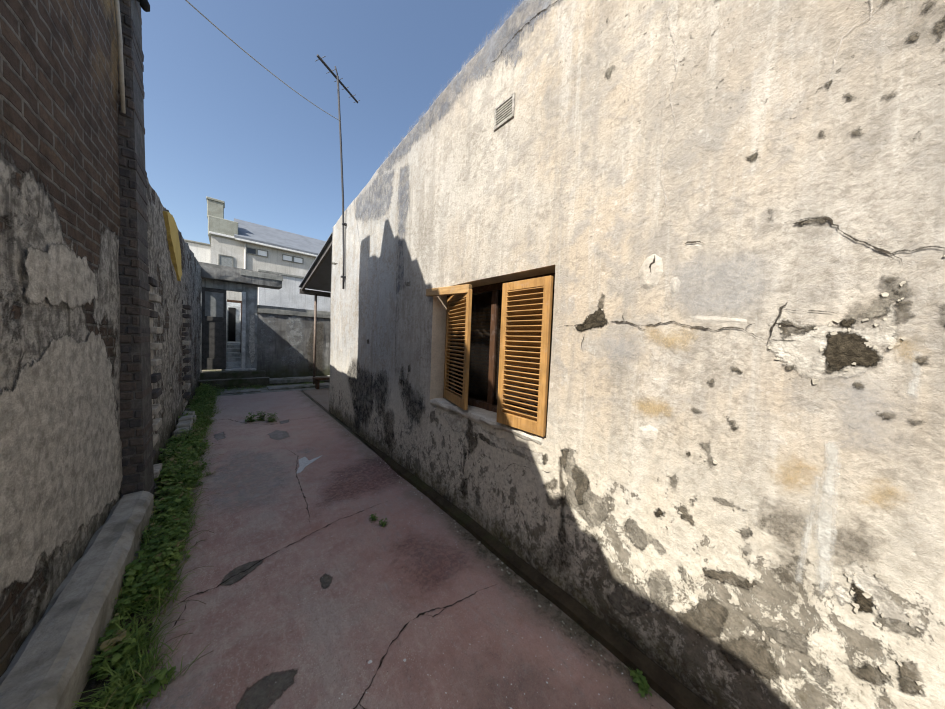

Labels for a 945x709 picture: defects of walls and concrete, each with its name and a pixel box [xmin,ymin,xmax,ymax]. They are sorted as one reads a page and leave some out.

crack [485,0,558,68]
crack [788,216,944,261]
crack [560,303,837,352]
peeling [767,275,916,390]
leakage [347,360,425,447]
leakage [460,420,477,497]
leakage [544,457,569,569]
peeling [236,669,297,709]
crack [353,586,491,709]
spalling [607,566,836,685]
peeling [835,561,927,638]
spalling [849,660,926,697]